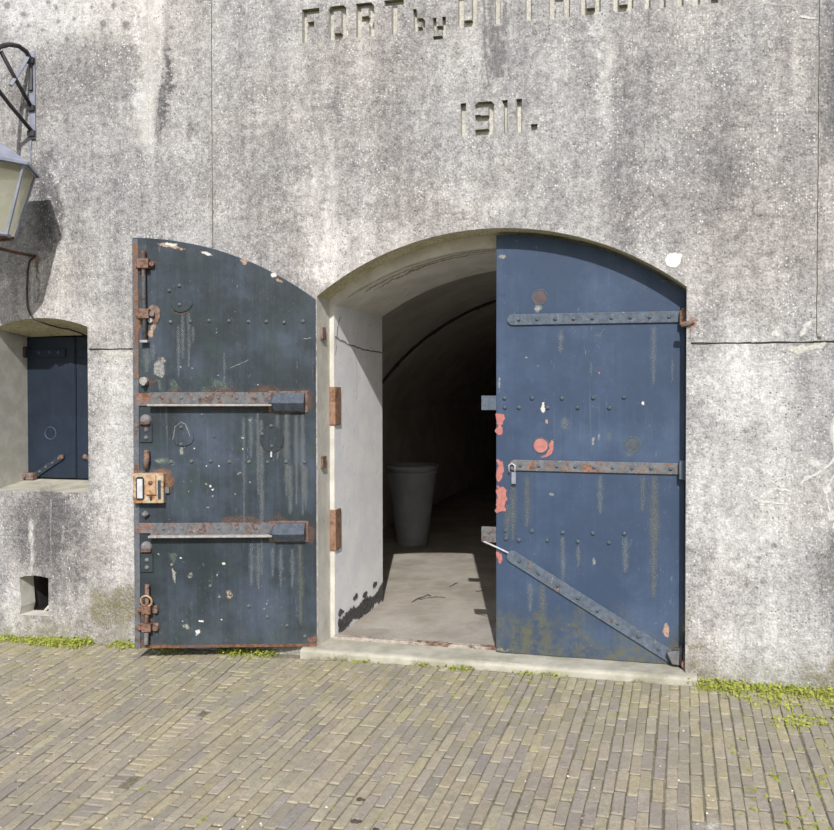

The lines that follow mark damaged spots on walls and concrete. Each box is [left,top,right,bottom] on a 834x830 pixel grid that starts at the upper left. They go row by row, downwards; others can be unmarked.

water stain [800,457,834,529]